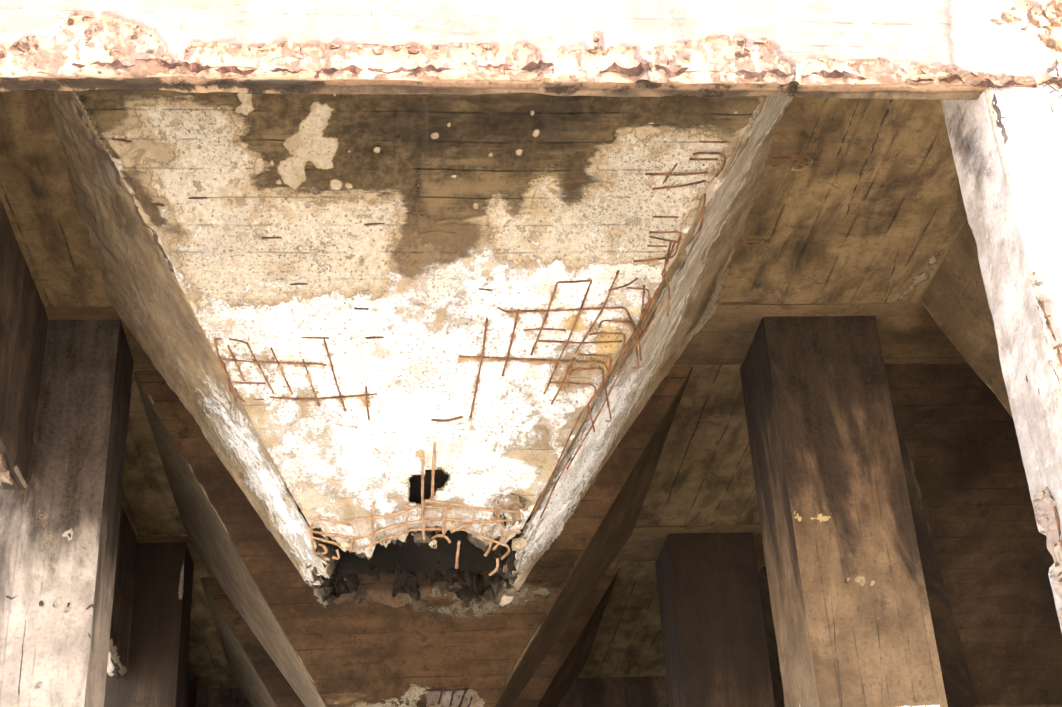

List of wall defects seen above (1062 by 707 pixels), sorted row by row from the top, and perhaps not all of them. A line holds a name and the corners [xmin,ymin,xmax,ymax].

spalling [0,0,1062,86]
peeling [113,93,401,311]
rust [259,344,331,401]
damp [75,89,765,585]
peeling [189,95,793,585]
rust [458,289,632,395]
spalling [1030,272,1062,397]
peeling [793,512,832,522]
spalling [1033,486,1062,626]